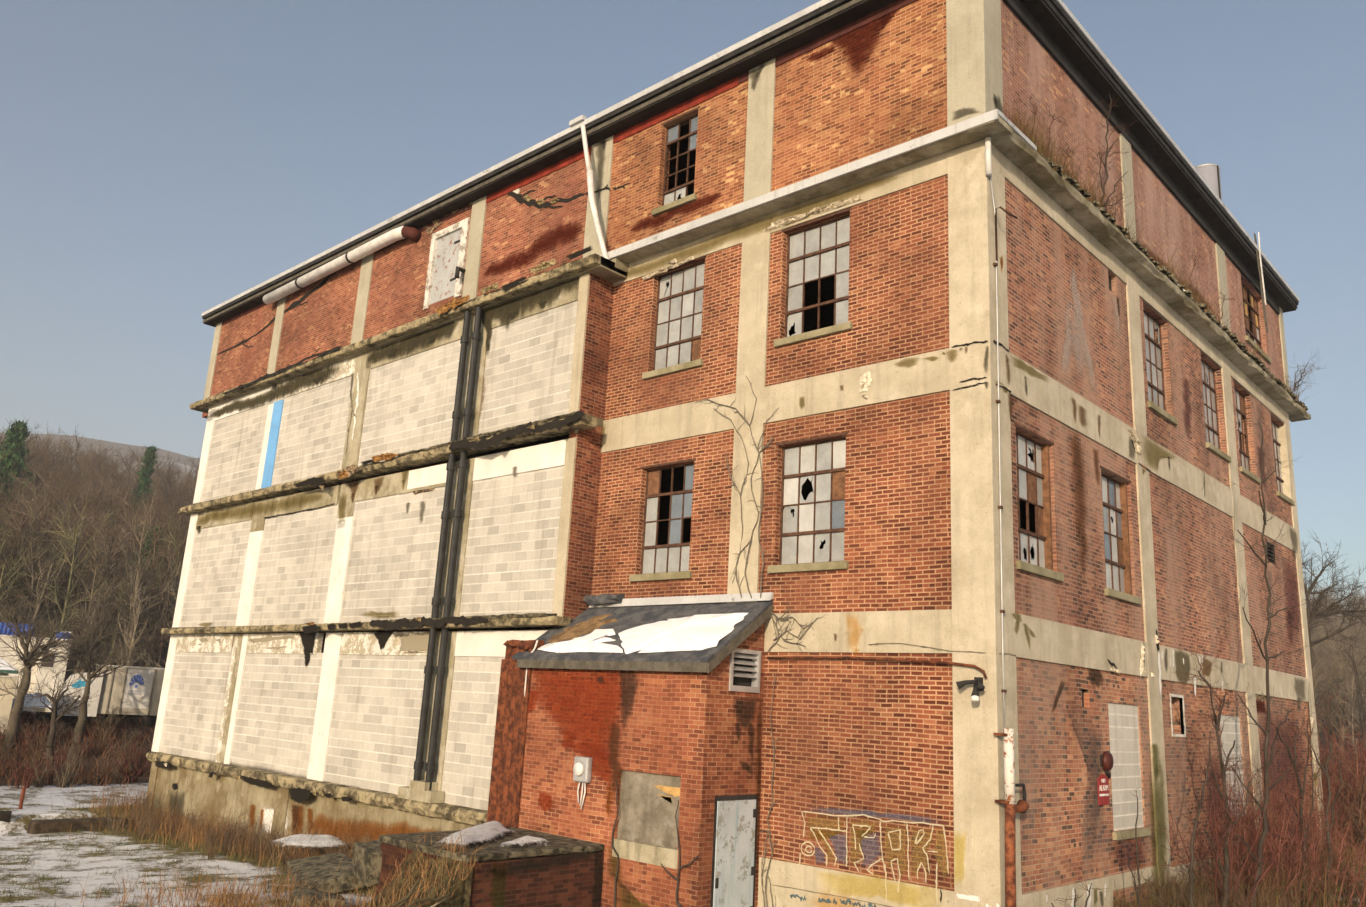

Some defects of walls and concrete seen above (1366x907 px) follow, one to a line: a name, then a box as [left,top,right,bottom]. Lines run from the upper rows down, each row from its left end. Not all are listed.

damp [809,11,895,66]
crack [507,183,630,209]
spalling [434,246,592,315]
damp [482,227,580,350]
crack [217,271,359,456]
spalling [449,411,585,450]
spalling [294,452,398,490]
spalling [250,615,488,653]